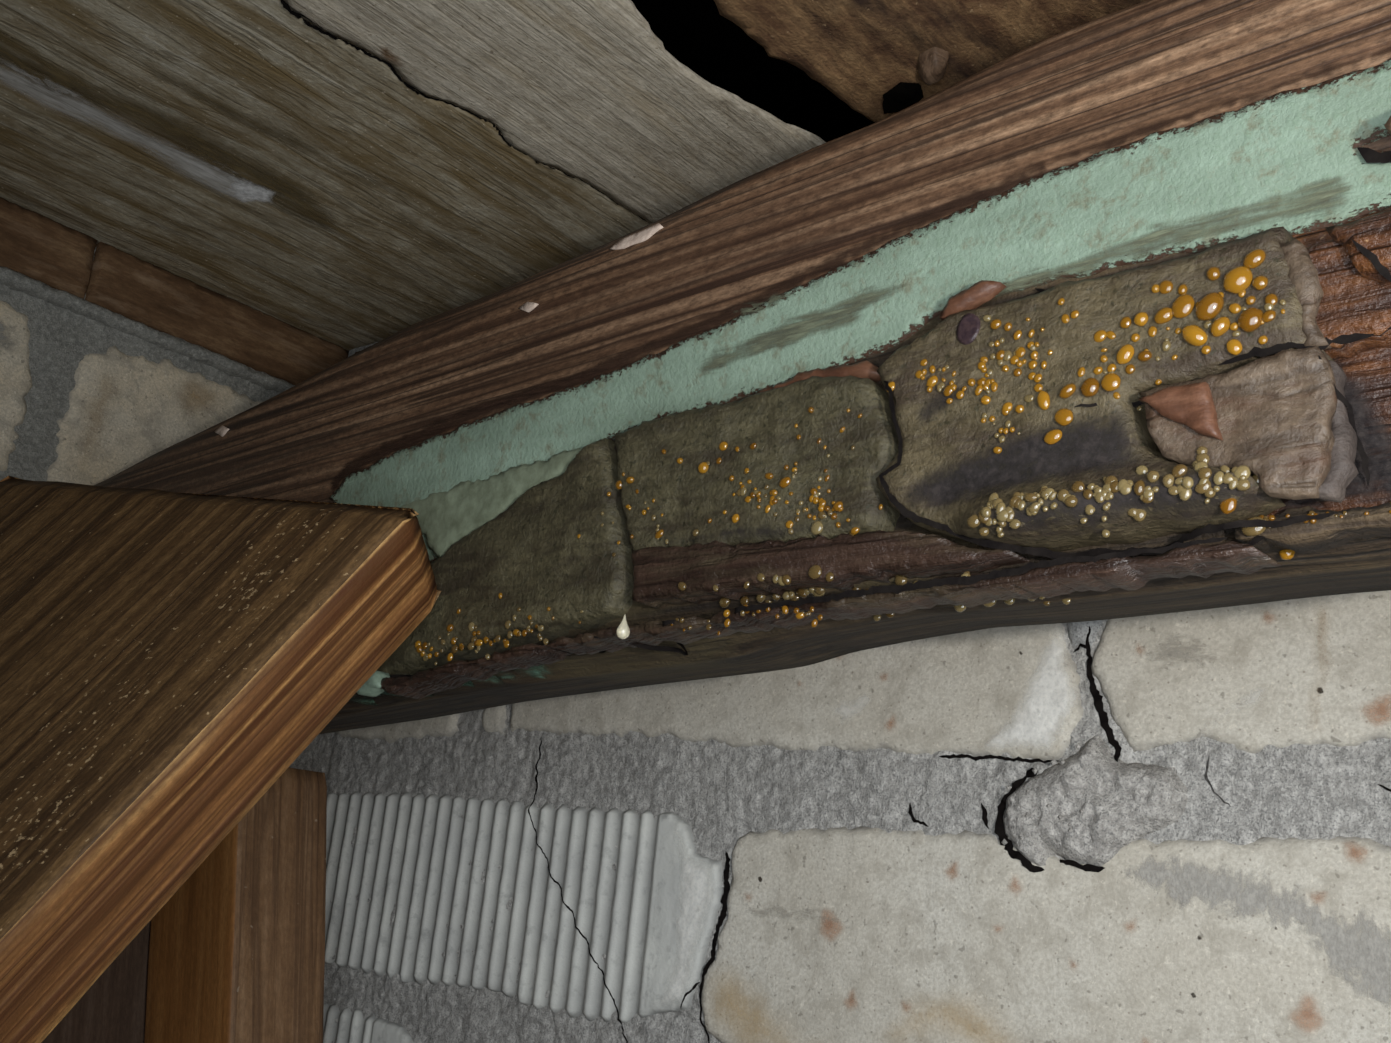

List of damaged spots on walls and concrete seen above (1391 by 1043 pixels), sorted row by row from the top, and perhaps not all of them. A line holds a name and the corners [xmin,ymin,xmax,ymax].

crack [281,0,646,221]
crack [1073,626,1122,762]
crack [528,737,628,1043]
crack [680,852,730,1043]
crack [908,803,929,827]
crack [939,754,1105,873]